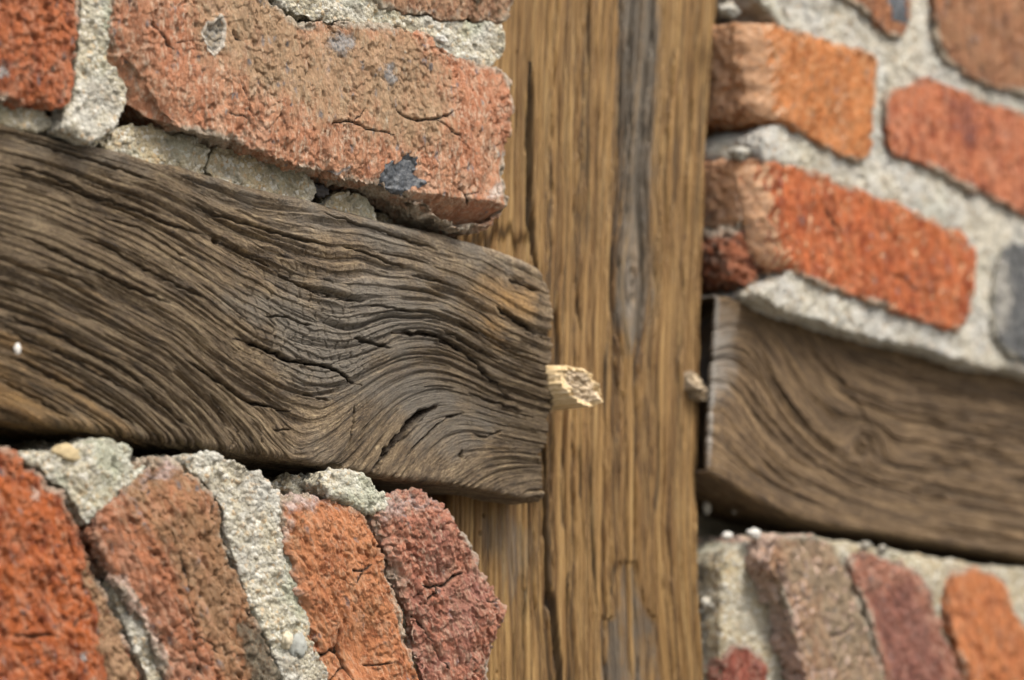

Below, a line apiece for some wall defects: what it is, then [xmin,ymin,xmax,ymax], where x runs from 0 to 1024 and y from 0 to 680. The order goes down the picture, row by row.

crack [331,109,462,139]
crack [380,405,464,456]
crack [410,572,463,669]